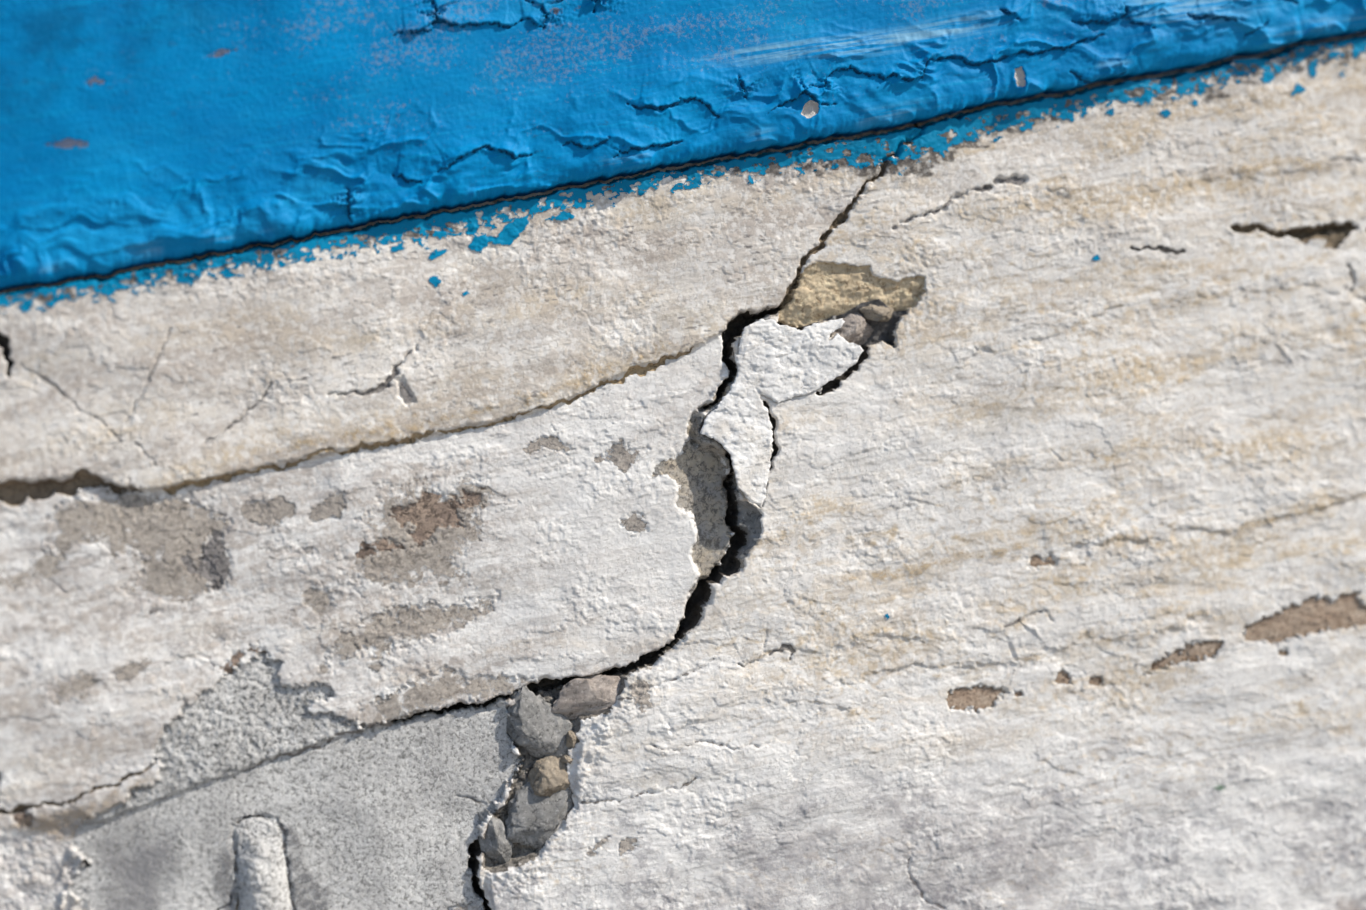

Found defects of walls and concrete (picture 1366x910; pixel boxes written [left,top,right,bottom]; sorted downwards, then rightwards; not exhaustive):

crack [1187,0,1299,39]
crack [392,0,1156,184]
peeling [801,100,819,118]
crack [1230,221,1366,303]
spalling [778,261,926,350]
crack [0,123,919,780]
peeling [1151,641,1223,670]
peeling [1243,591,1366,656]
peeling [68,476,653,910]
peeling [946,685,1022,713]
crack [581,741,759,804]
crack [468,839,491,910]